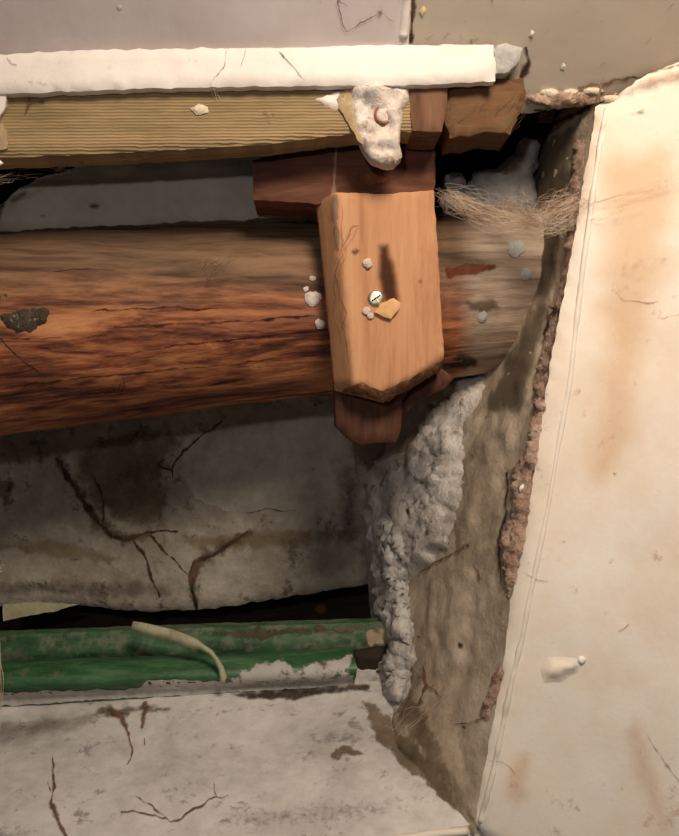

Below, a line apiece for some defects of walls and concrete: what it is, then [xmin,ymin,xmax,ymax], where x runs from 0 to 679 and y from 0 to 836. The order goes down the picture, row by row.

crack [337,0,417,43]
spalling [497,138,587,598]
leakage [80,431,178,523]
crack [156,421,222,479]
crack [55,456,291,610]
peeling [131,621,353,687]
crack [47,757,68,836]
crack [121,784,228,822]